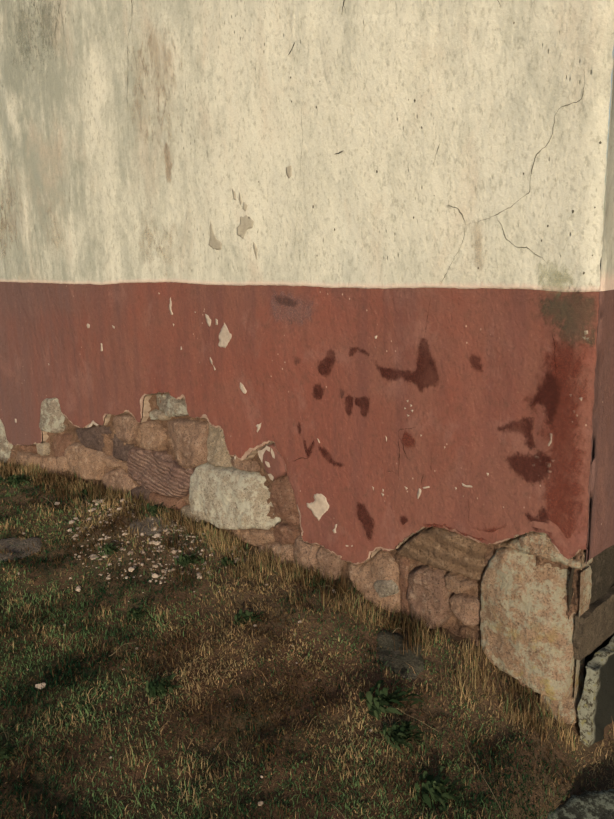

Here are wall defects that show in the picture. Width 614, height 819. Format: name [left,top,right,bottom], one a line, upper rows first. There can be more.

peeling [209,220,222,250]
peeling [232,189,254,239]
crack [424,71,585,336]
peeling [195,312,232,348]
leakage [318,356,335,375]
leakage [378,339,437,390]
leakage [346,395,369,416]
leakage [499,343,582,538]
flaking render [1,392,449,578]
leakage [357,504,373,539]
flaking render [528,543,587,617]
flaking render [442,612,481,646]